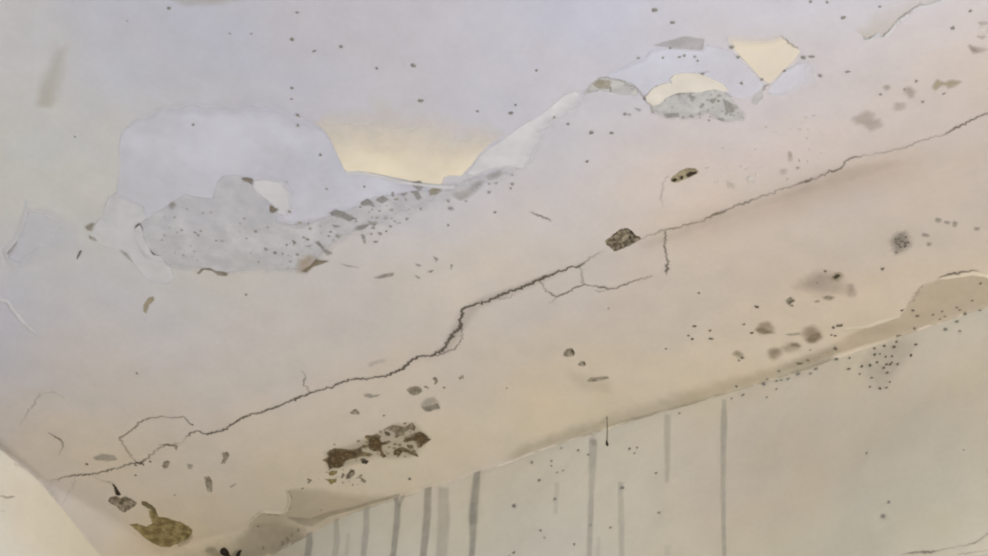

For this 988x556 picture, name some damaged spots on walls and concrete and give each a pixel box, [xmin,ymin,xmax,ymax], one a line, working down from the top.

peeling [88,39,804,283]
crack [165,264,629,448]
crack [69,418,149,494]